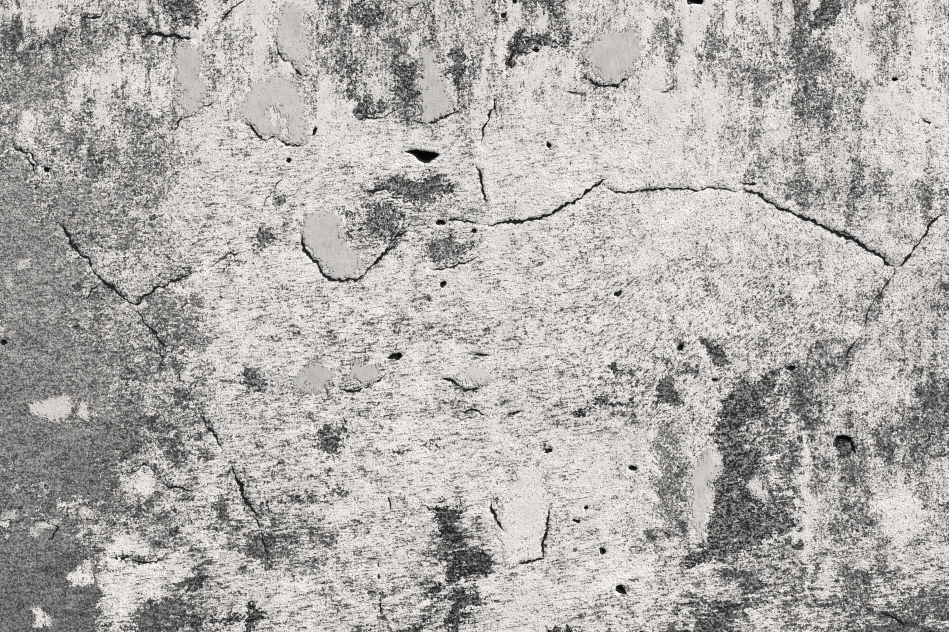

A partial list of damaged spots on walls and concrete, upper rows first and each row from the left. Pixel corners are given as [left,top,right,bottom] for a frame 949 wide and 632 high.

spalling [116,0,209,39]
peeling [235,1,313,148]
peeling [336,37,484,128]
crack [482,99,496,139]
peeling [503,0,645,91]
damp [0,26,239,483]
peeling [300,169,483,282]
crack [446,166,944,364]
spalling [0,109,192,632]
crack [55,221,268,563]
spalling [309,418,354,466]
spalling [117,564,268,632]